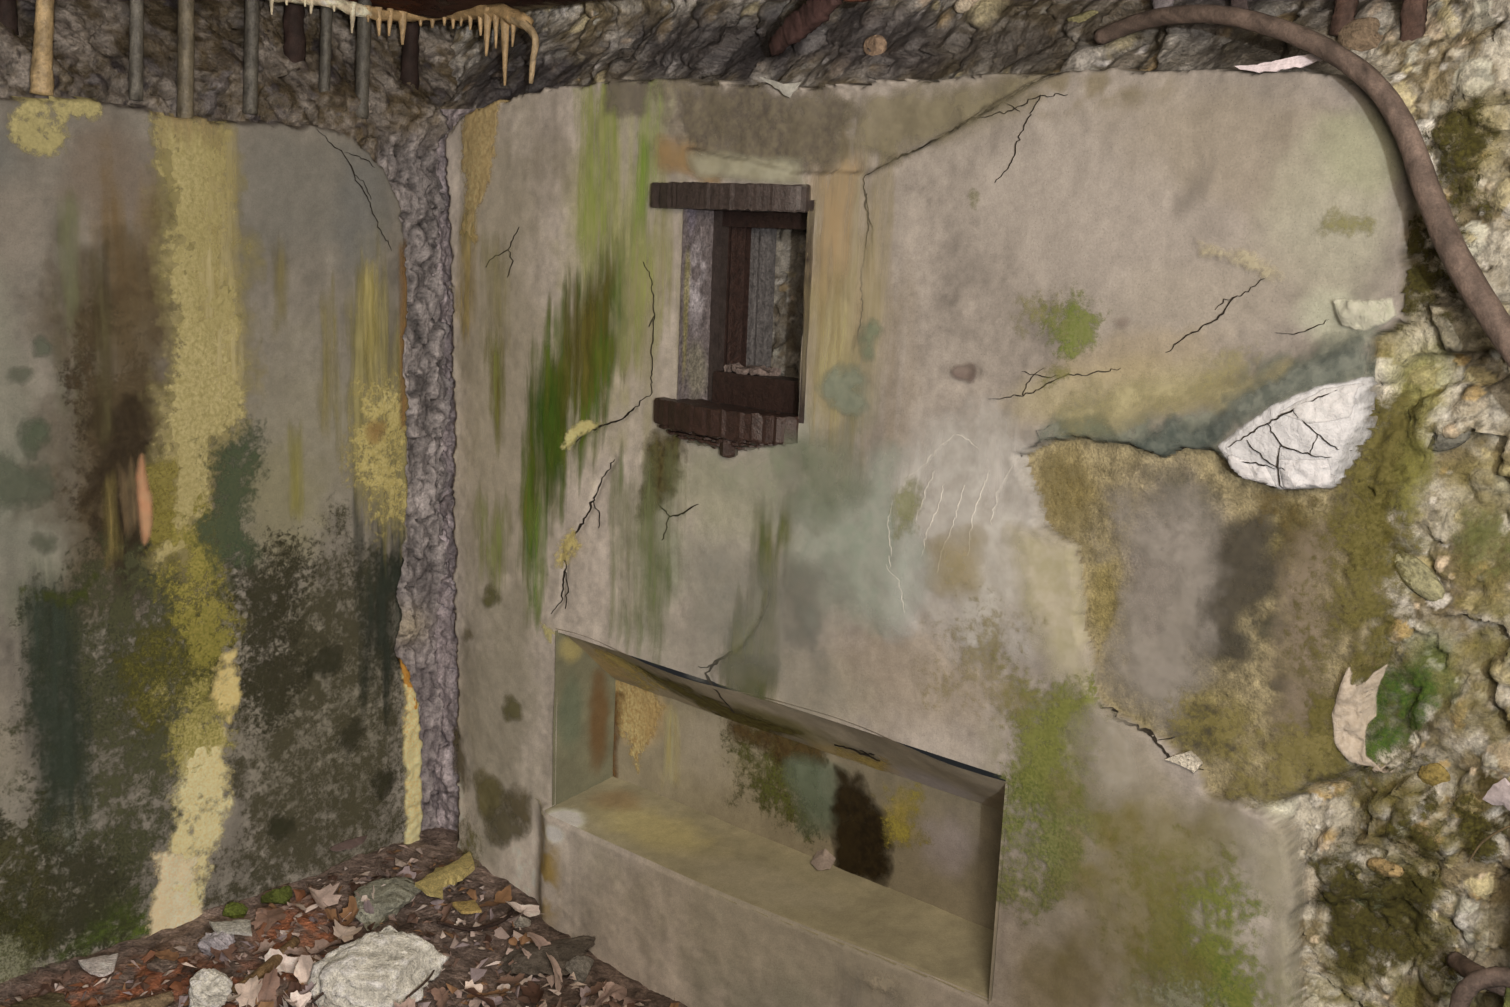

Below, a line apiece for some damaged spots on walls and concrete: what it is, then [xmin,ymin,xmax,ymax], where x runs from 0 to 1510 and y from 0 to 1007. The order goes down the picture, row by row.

rust [0,0,19,35]
leakage [9,96,102,156]
spalling [0,0,178,117]
rust [349,0,582,92]
spalling [194,0,1311,145]
leakage [630,79,665,322]
crack [851,73,1068,367]
leakage [0,111,423,983]
crack [551,262,655,614]
spalling [1027,0,1510,1007]
crack [1228,390,1353,489]
crack [1098,702,1204,770]